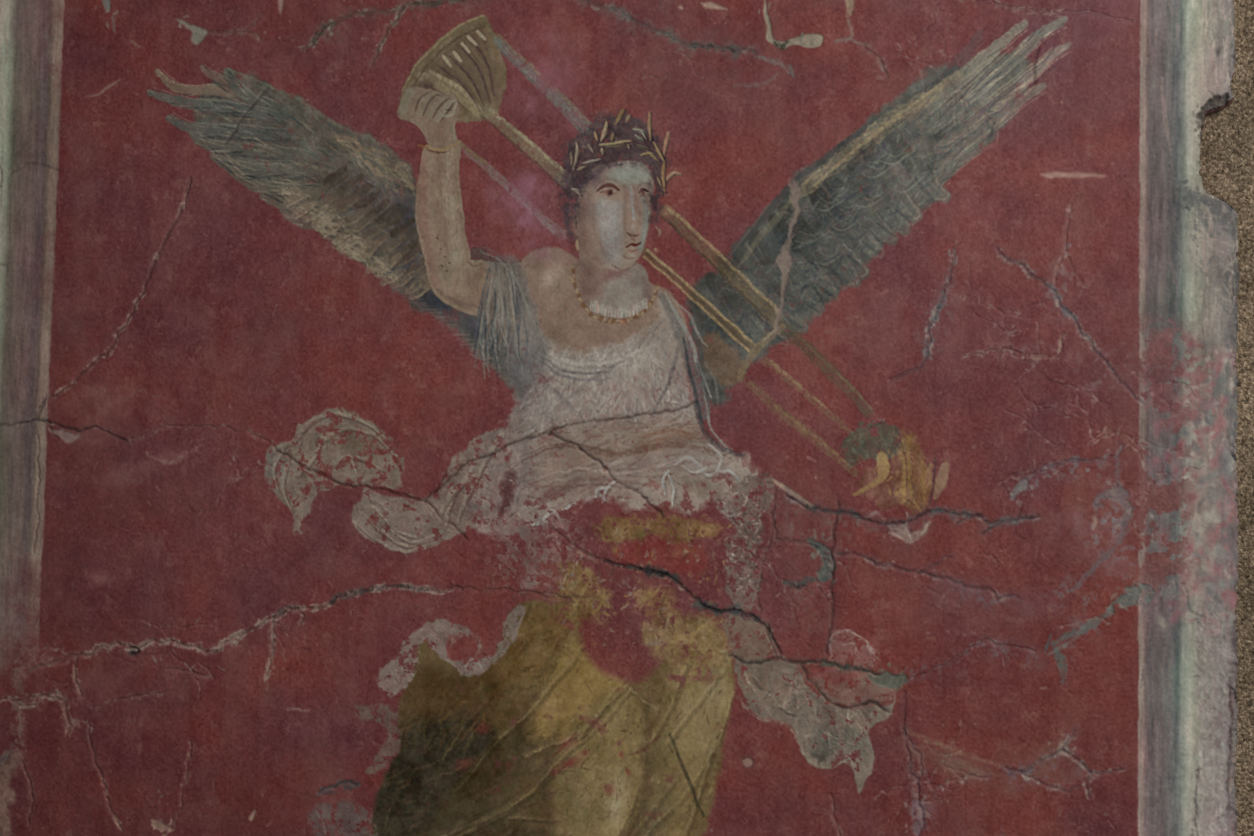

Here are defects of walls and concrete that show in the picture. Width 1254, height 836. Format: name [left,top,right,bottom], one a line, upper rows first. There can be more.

crack [296,0,459,72]
crack [574,0,762,65]
peeling [701,0,728,12]
spalling [732,0,824,89]
spalling [1191,89,1231,141]
crack [0,173,199,553]
crack [276,200,1205,836]